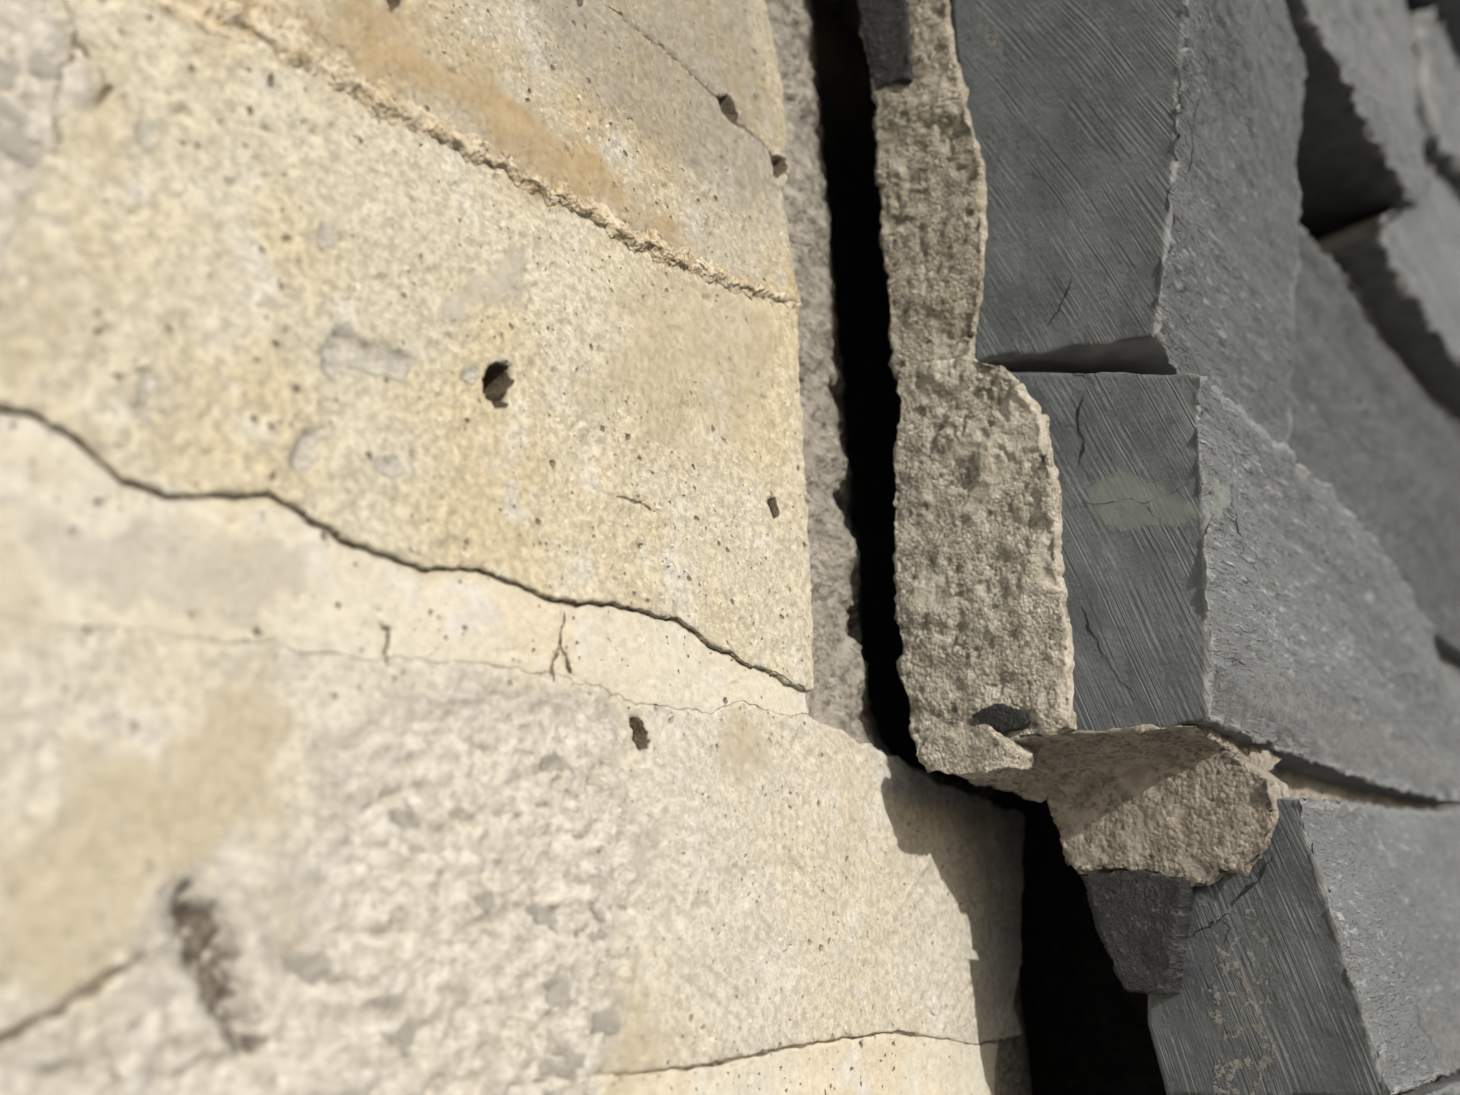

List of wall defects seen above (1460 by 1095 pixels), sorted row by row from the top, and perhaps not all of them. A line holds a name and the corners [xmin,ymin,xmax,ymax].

crack [53,0,114,154]
crack [600,0,716,98]
crack [738,124,788,176]
crack [0,406,807,692]
spalling [0,677,651,1095]
crack [0,960,138,1043]
crack [613,1030,1002,1095]